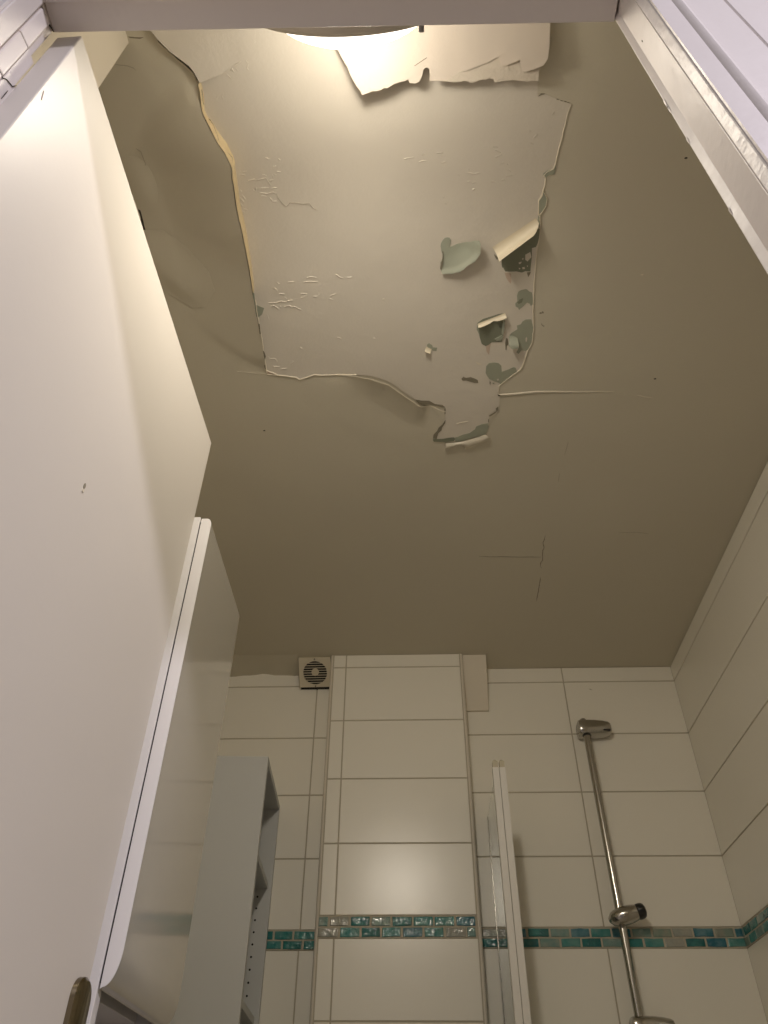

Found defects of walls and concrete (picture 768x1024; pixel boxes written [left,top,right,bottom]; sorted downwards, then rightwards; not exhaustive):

flaking render [121,23,571,442]